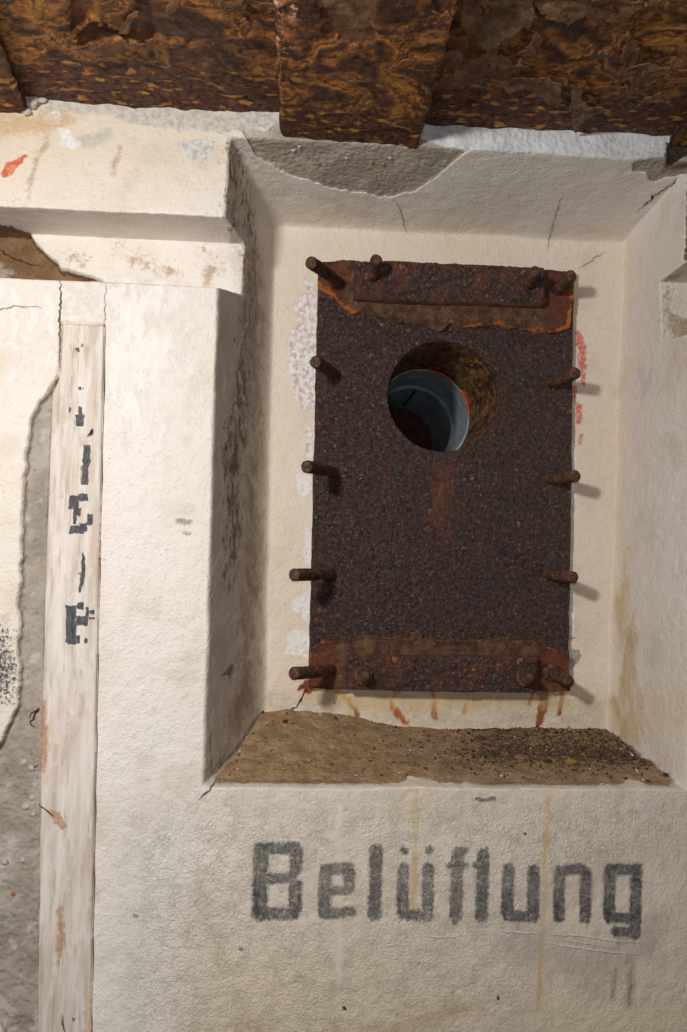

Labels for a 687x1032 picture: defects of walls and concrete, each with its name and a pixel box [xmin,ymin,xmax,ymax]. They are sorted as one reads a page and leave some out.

rust [119,11,139,35]
rust [432,0,644,133]
rust [626,62,674,108]
flaking render [243,124,466,197]
rust [661,142,687,173]
flaking render [632,152,687,260]
damp [0,612,19,712]
flaking render [0,379,59,1032]
rust [297,679,572,726]